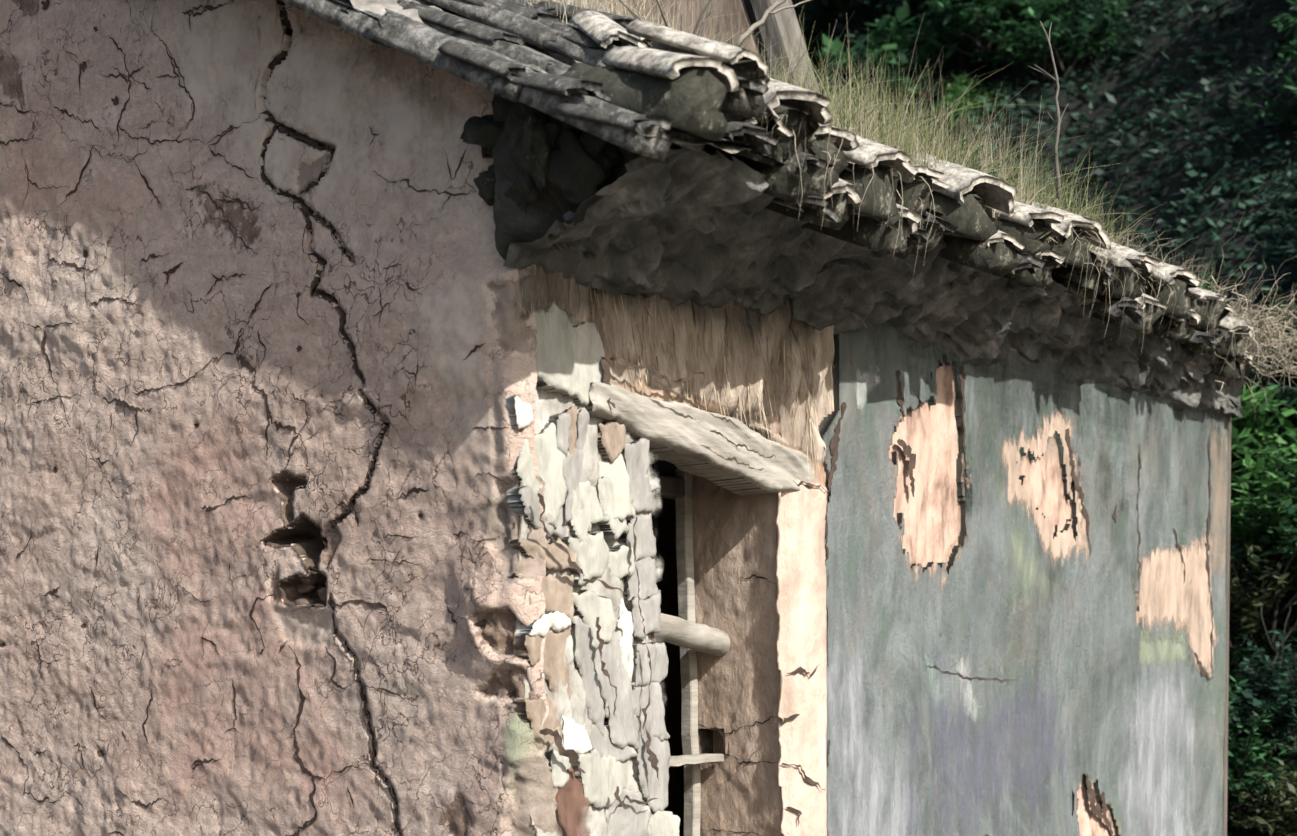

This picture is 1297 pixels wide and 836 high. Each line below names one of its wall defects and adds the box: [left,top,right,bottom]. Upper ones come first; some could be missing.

crack [369,127,477,212]
crack [0,0,422,565]
crack [42,587,60,598]
spalling [271,573,281,606]
crack [400,487,430,499]
peeling [472,281,680,836]
peeling [888,363,972,588]
peeling [1002,407,1089,563]
peeling [1135,534,1218,678]
crack [90,563,409,836]
crack [0,736,171,810]
peeling [1076,776,1121,836]